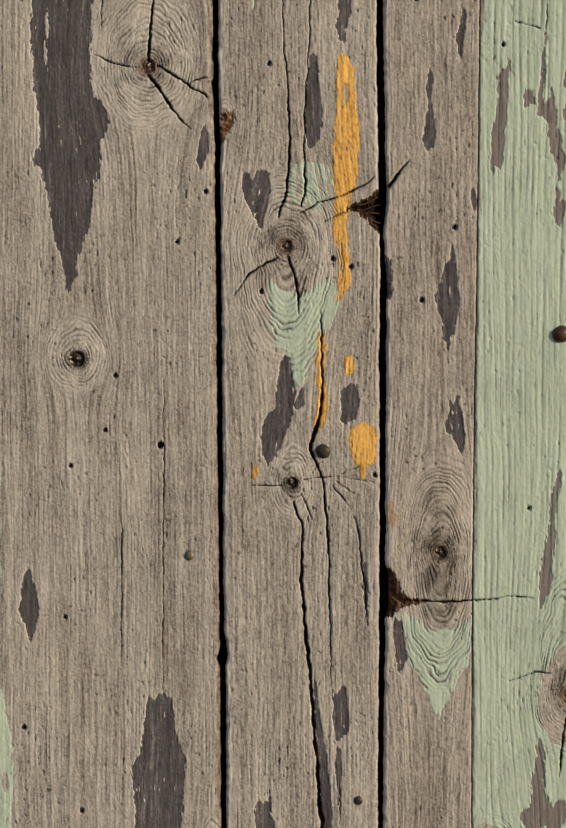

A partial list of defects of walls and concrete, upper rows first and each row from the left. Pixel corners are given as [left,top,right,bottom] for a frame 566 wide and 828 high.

peeling [29,0,110,294]
crack [94,0,207,127]
peeling [241,170,271,228]
crack [234,257,299,314]
peeling [251,0,360,480]
crack [278,0,409,222]
peeling [340,354,378,480]
peeling [393,0,566,828]
crack [293,315,373,828]
crack [400,595,533,603]
peeling [132,694,186,828]
crack [558,718,566,770]